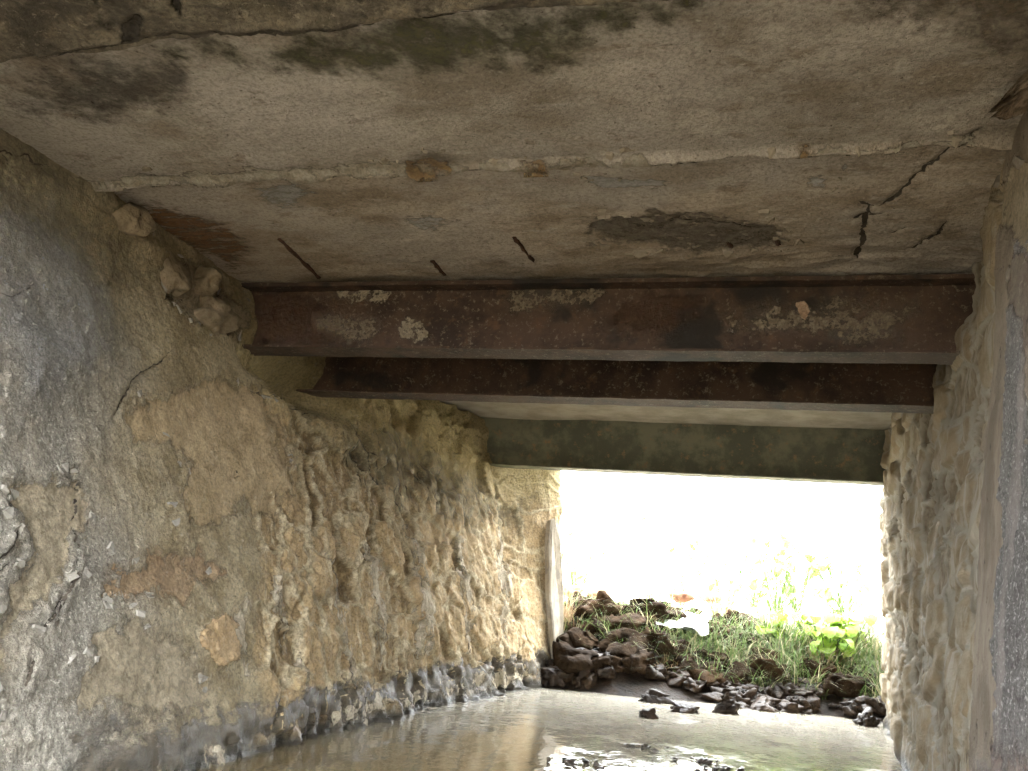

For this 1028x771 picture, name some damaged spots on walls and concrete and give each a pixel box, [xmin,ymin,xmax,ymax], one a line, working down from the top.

crack [412,0,535,19]
crack [46,23,374,57]
water stain [27,61,187,122]
spalling [77,147,695,192]
crack [853,127,982,258]
spalling [579,209,805,259]
water stain [69,525,548,771]